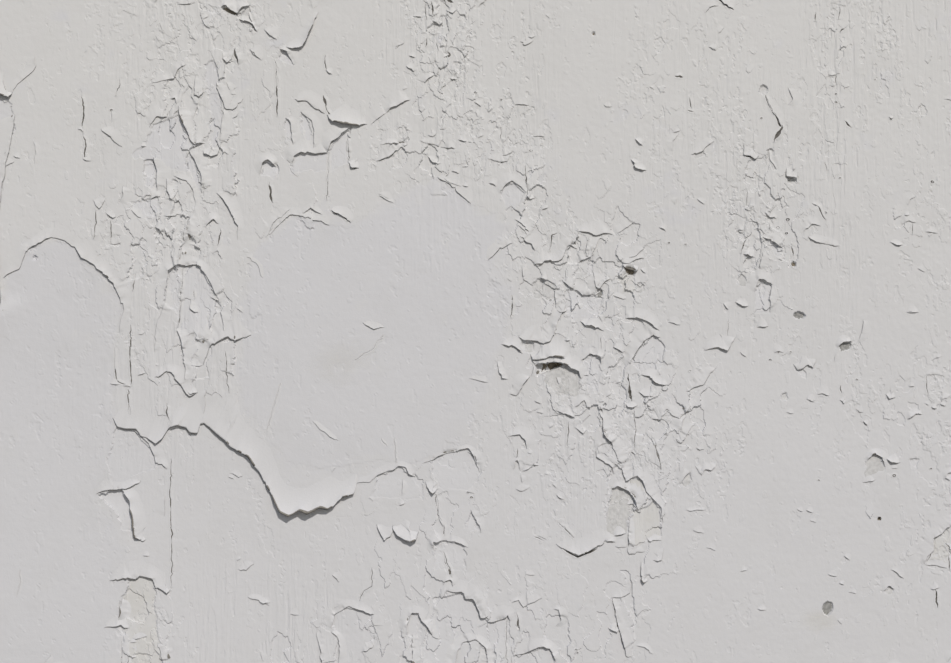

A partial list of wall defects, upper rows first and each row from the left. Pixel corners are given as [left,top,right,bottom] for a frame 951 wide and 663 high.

peeling [0,0,562,663]
peeling [488,126,716,578]
peeling [704,200,839,357]
crack [556,526,612,560]
crack [608,563,653,657]